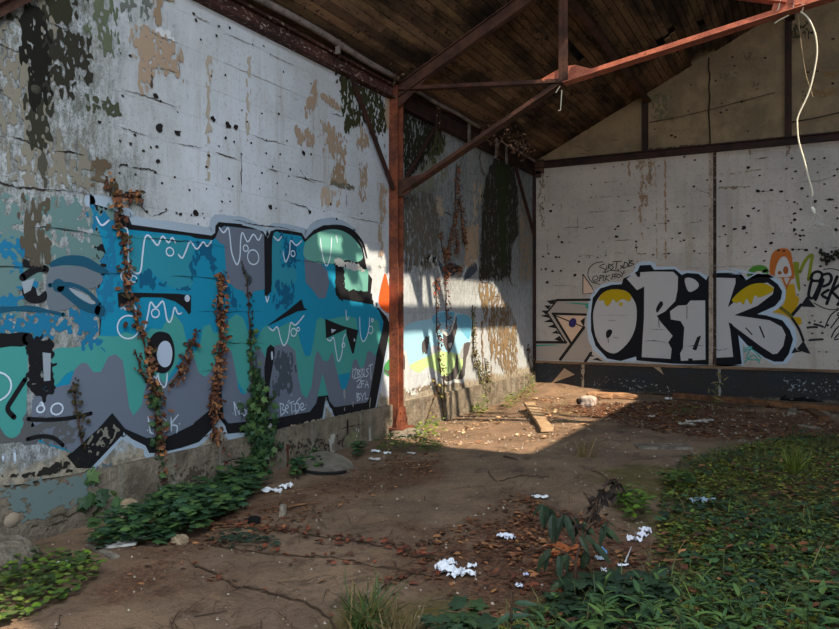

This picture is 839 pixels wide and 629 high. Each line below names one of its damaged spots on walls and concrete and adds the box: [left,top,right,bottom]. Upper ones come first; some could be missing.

damp [27,0,58,40]
damp [0,10,91,192]
damp [83,0,153,59]
peeling [120,0,184,102]
peeling [286,79,369,212]
peeling [377,183,389,257]